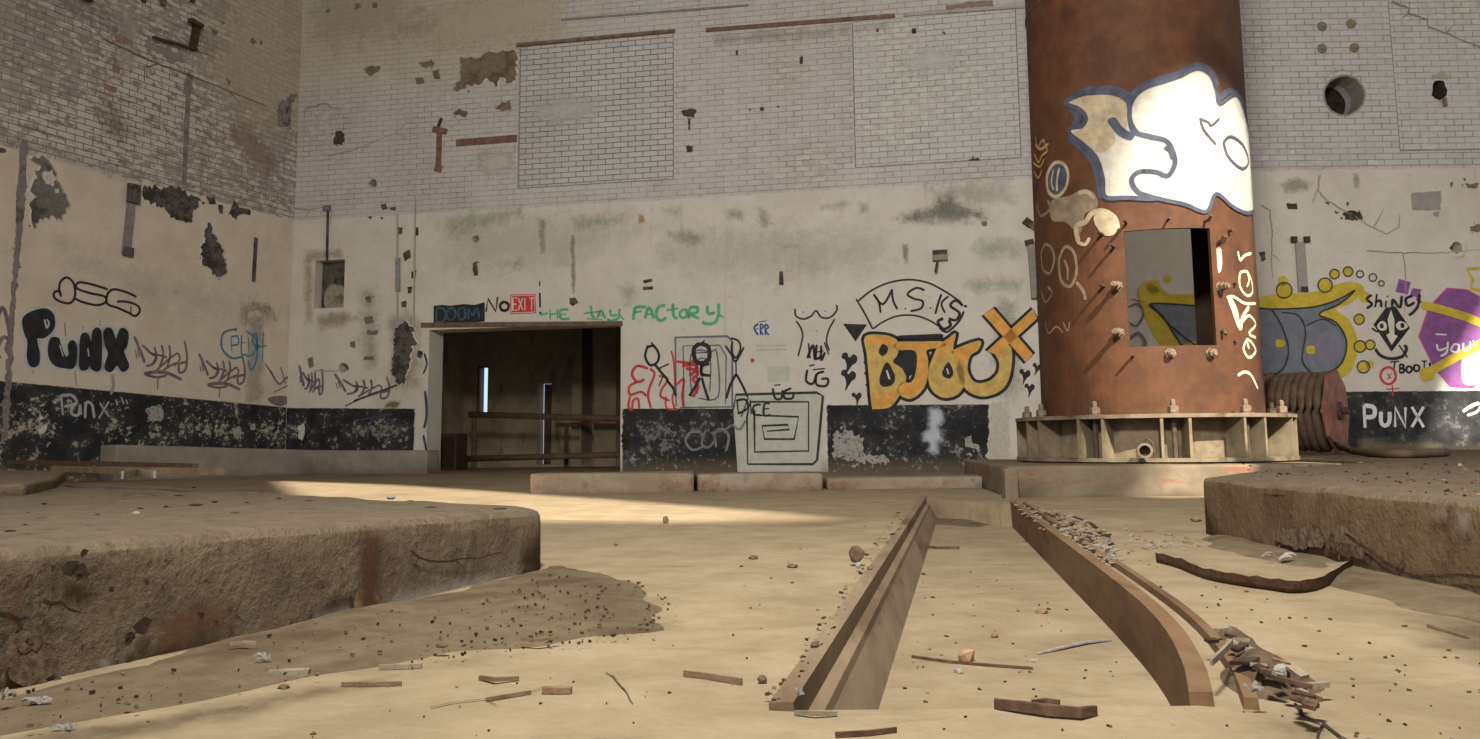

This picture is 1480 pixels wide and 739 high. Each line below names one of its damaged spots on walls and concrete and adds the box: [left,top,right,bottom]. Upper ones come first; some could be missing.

crack [1392,0,1480,47]
spalling [415,49,520,118]
spalling [16,153,71,230]
spalling [142,185,251,280]
spalling [350,203,423,387]